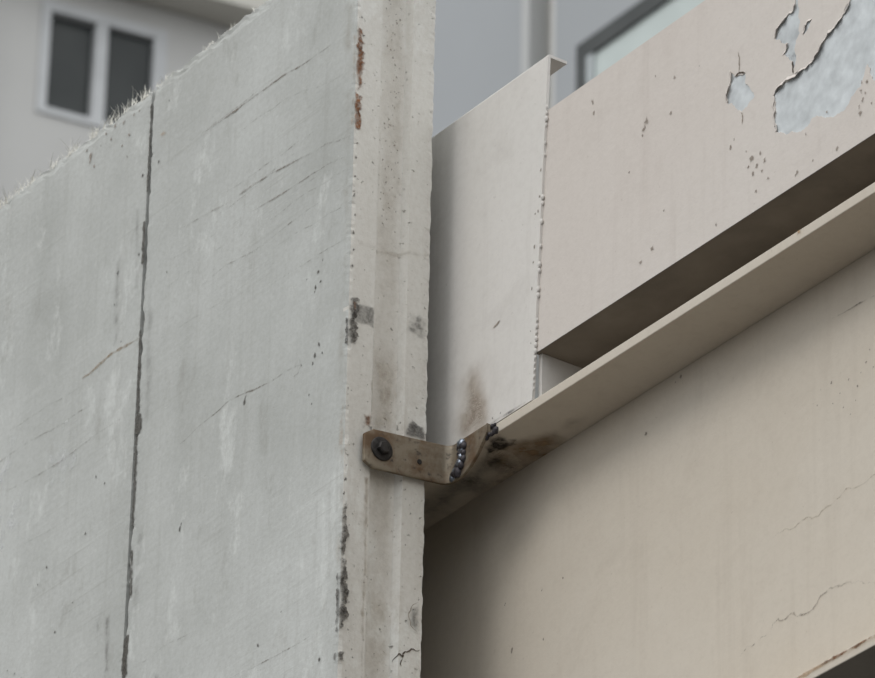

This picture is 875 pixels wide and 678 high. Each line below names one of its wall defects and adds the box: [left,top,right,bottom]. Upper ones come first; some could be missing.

corrosion [355,28,364,129]
peeling [725,53,754,121]
peeling [772,0,875,135]